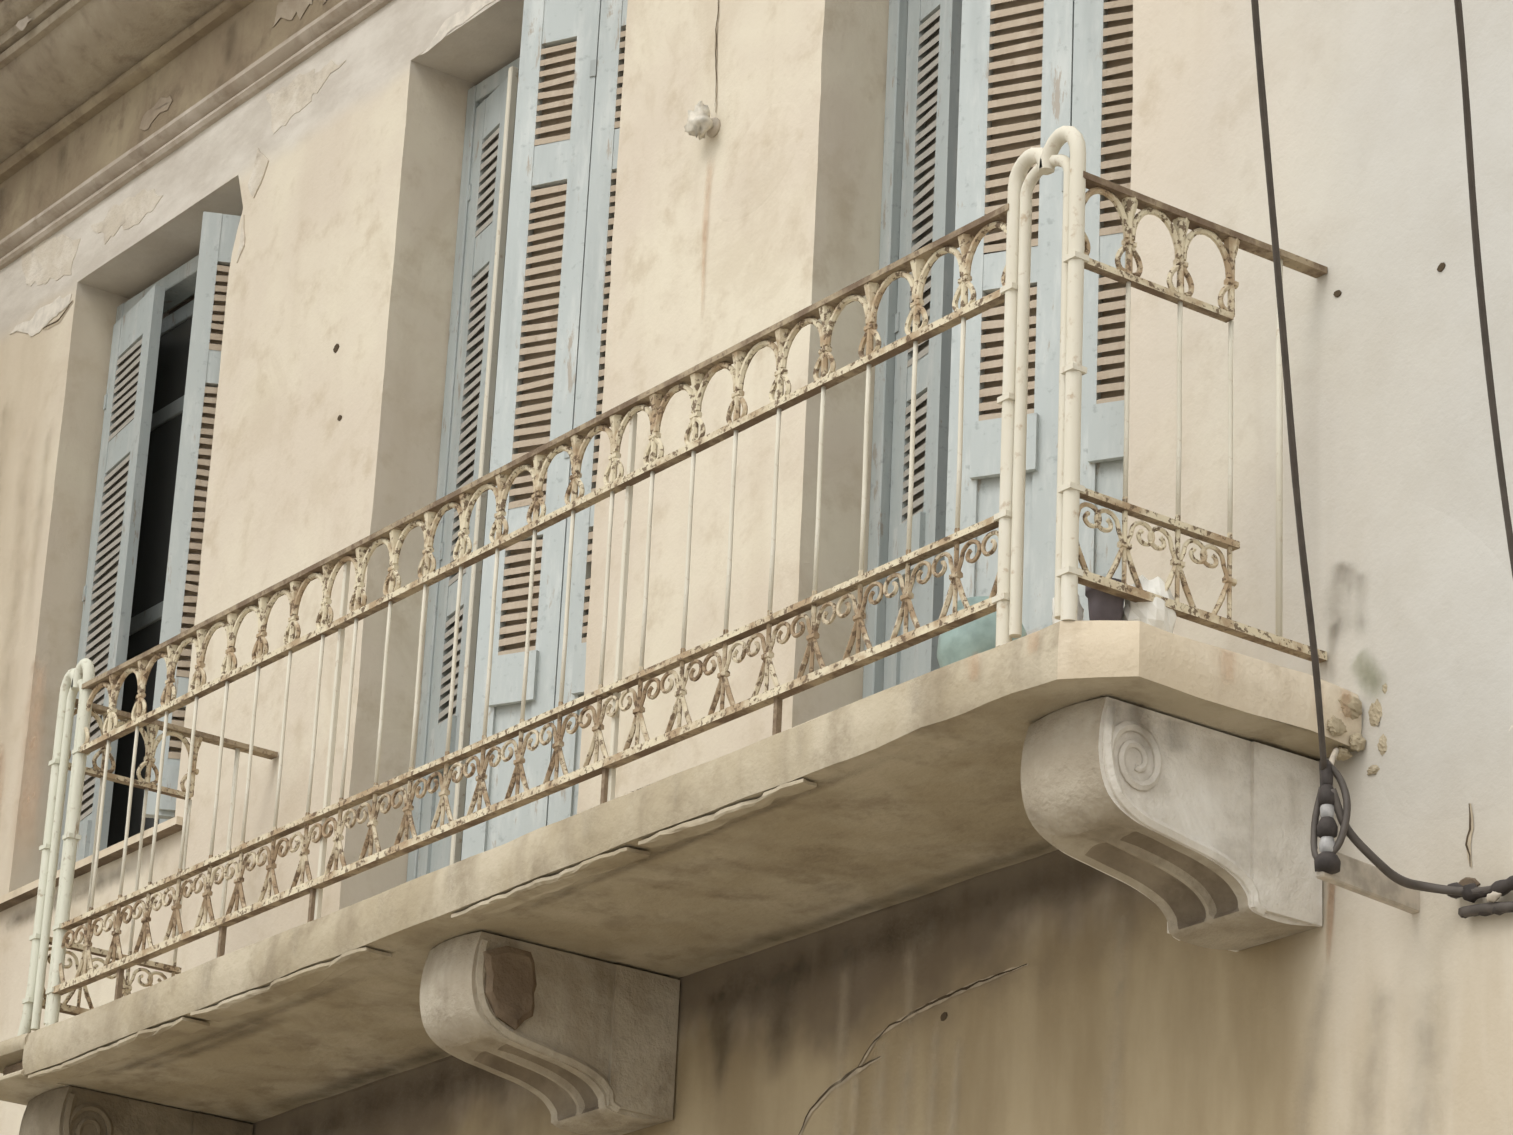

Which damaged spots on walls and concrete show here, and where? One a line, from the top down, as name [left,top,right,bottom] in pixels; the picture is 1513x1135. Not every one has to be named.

peeling [272,0,326,28]
spalling [1326,683,1387,775]
crack [799,963,1028,1135]